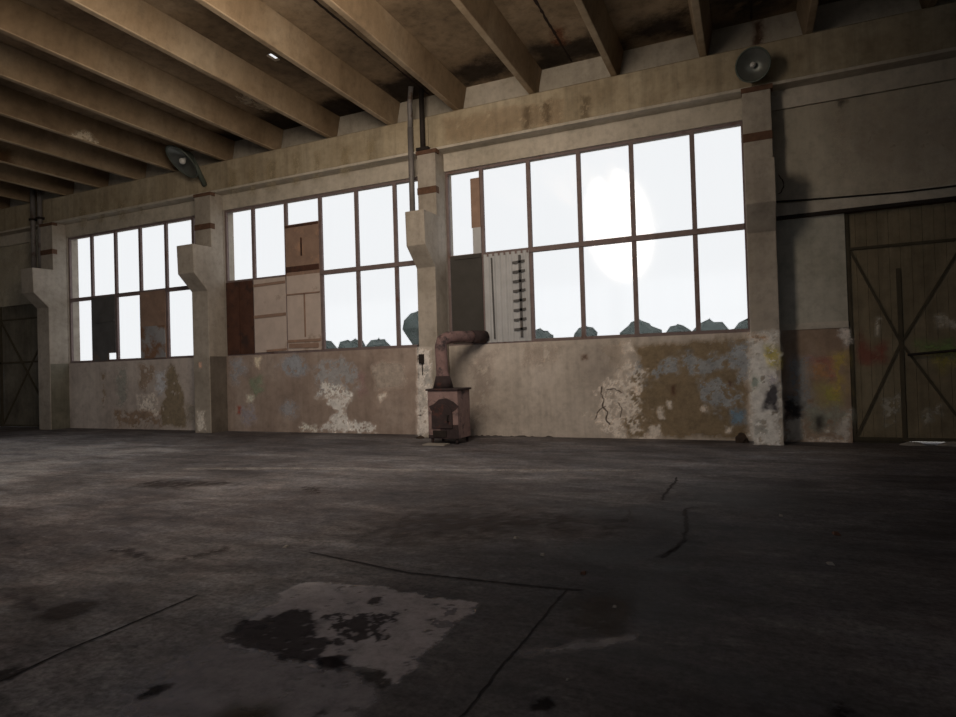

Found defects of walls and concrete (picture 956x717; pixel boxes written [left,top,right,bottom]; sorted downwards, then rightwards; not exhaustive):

peeling [102,365,204,431]
peeling [301,382,376,433]
peeling [417,349,431,433]
peeling [598,333,803,445]
crack [655,477,700,557]
peeling [125,582,477,717]